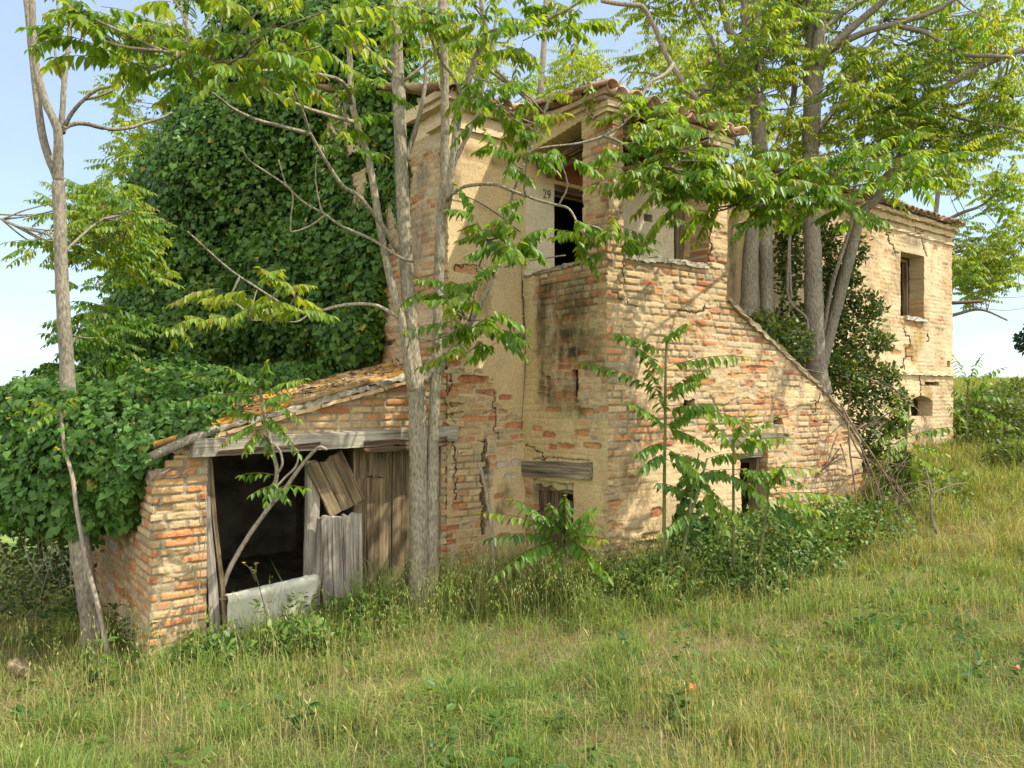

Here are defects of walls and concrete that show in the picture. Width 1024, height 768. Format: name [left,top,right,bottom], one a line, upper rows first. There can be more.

crack [882,223,927,256]
crack [902,328,929,397]
spalling [448,373,486,396]
crack [446,373,499,534]
crack [525,444,590,461]